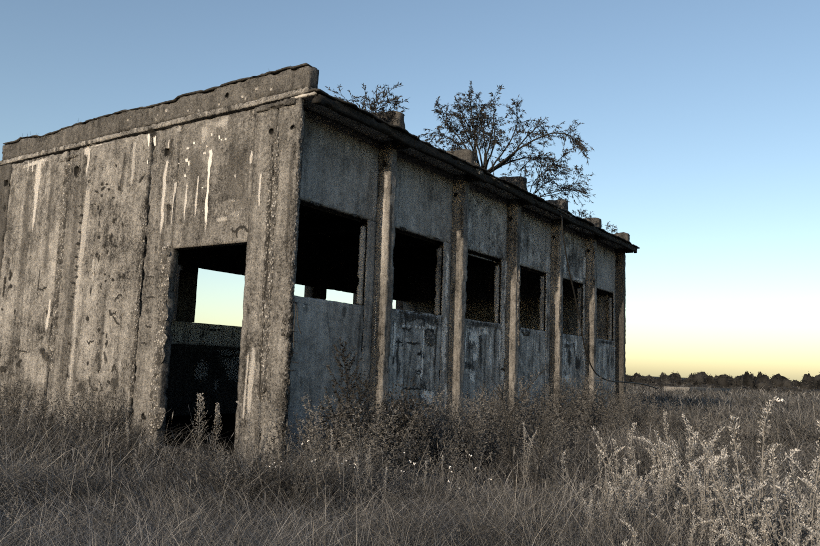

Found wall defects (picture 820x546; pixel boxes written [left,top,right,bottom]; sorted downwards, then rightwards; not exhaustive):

damp [160,139,212,229]
damp [69,188,90,392]
damp [393,310,444,378]